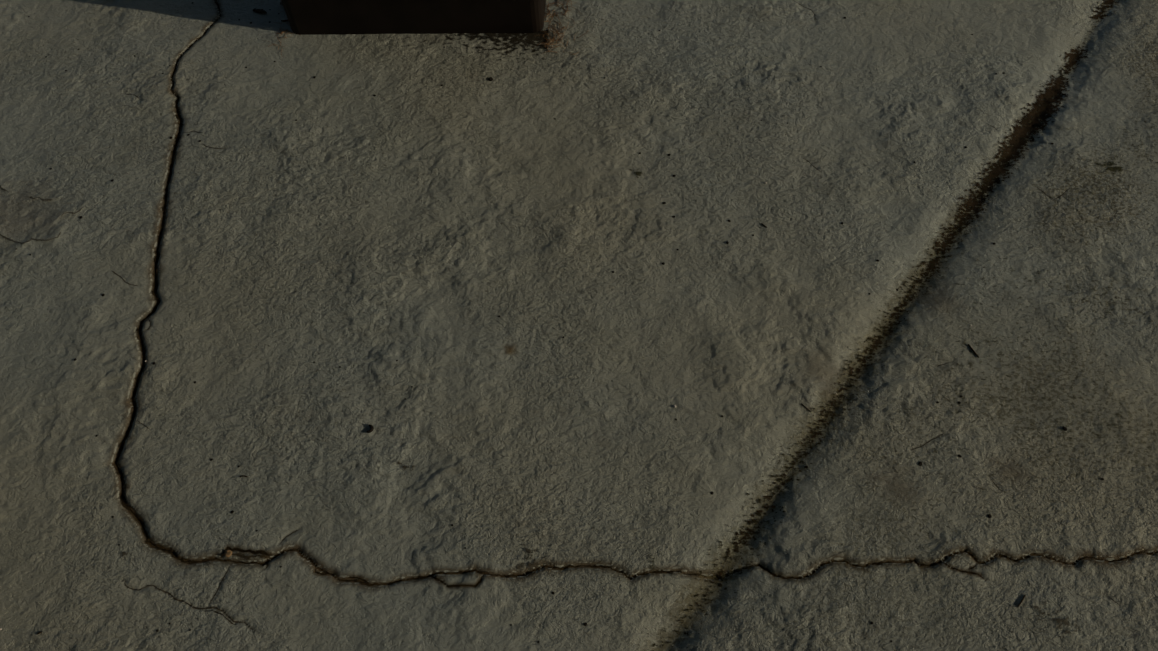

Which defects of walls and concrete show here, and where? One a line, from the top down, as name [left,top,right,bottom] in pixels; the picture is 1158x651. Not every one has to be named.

crack [111,0,720,588]
crack [717,548,1158,580]
crack [125,585,237,625]